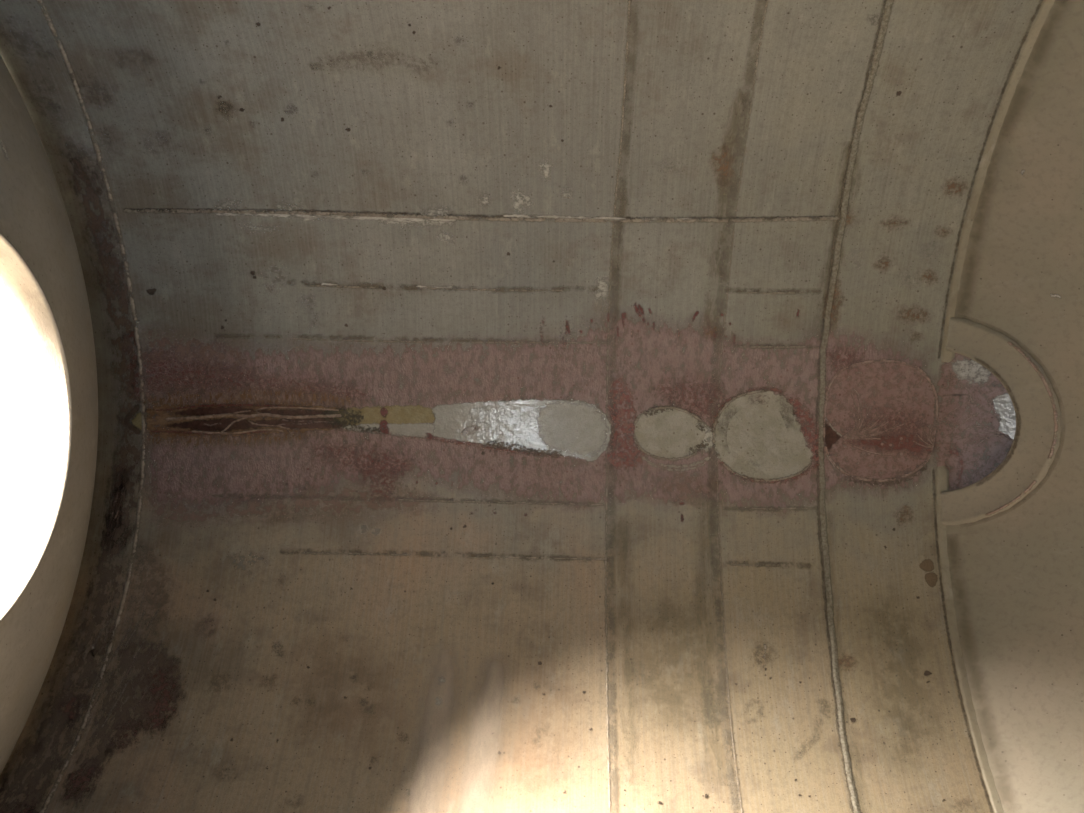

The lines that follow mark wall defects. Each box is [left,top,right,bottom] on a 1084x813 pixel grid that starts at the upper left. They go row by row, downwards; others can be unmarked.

corrosion [122,284,1016,522]